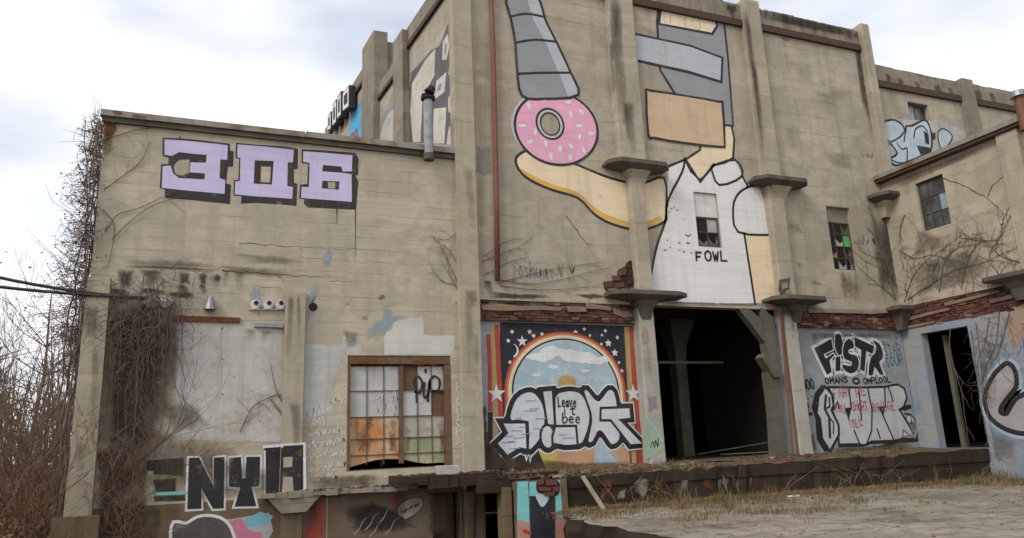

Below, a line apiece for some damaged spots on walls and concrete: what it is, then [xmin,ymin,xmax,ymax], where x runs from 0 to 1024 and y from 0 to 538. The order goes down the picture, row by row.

water stain [143,275,204,297]
spalling [603,260,635,292]